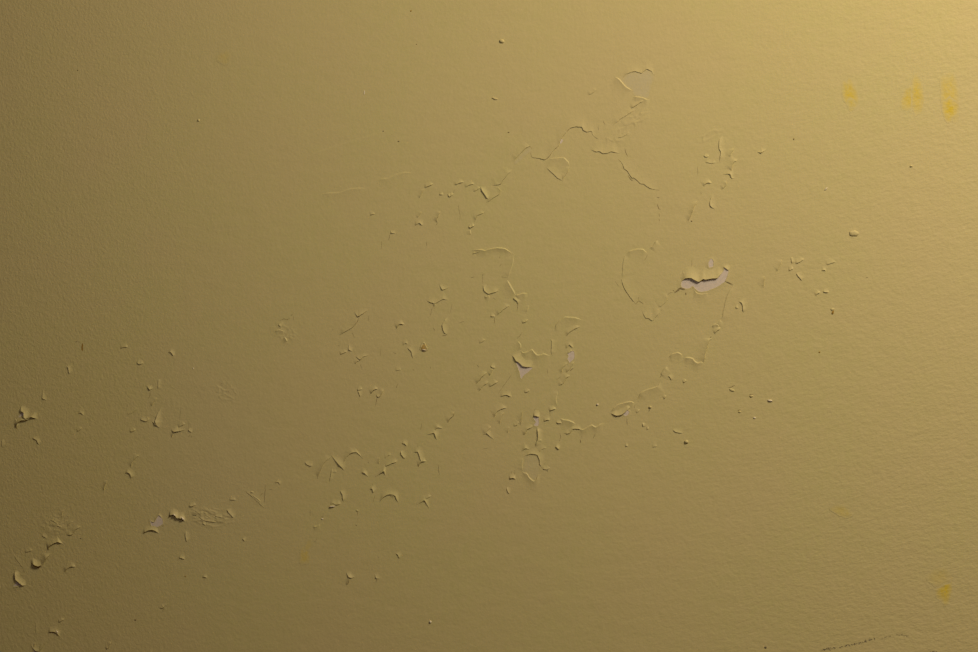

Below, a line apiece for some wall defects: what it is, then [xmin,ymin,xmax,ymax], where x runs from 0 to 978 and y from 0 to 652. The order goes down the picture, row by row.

peeling [642,255,733,321]